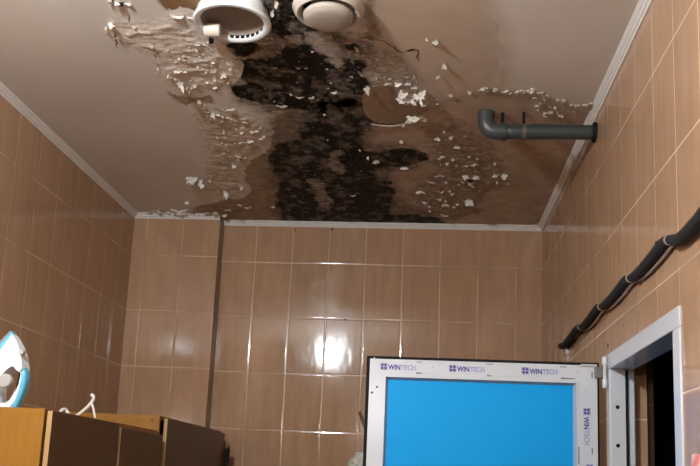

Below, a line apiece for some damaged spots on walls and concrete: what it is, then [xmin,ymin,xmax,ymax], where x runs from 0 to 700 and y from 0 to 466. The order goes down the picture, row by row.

peeling [97,0,274,218]
water stain [194,0,588,231]
peeling [350,41,509,220]
peeling [467,87,593,119]